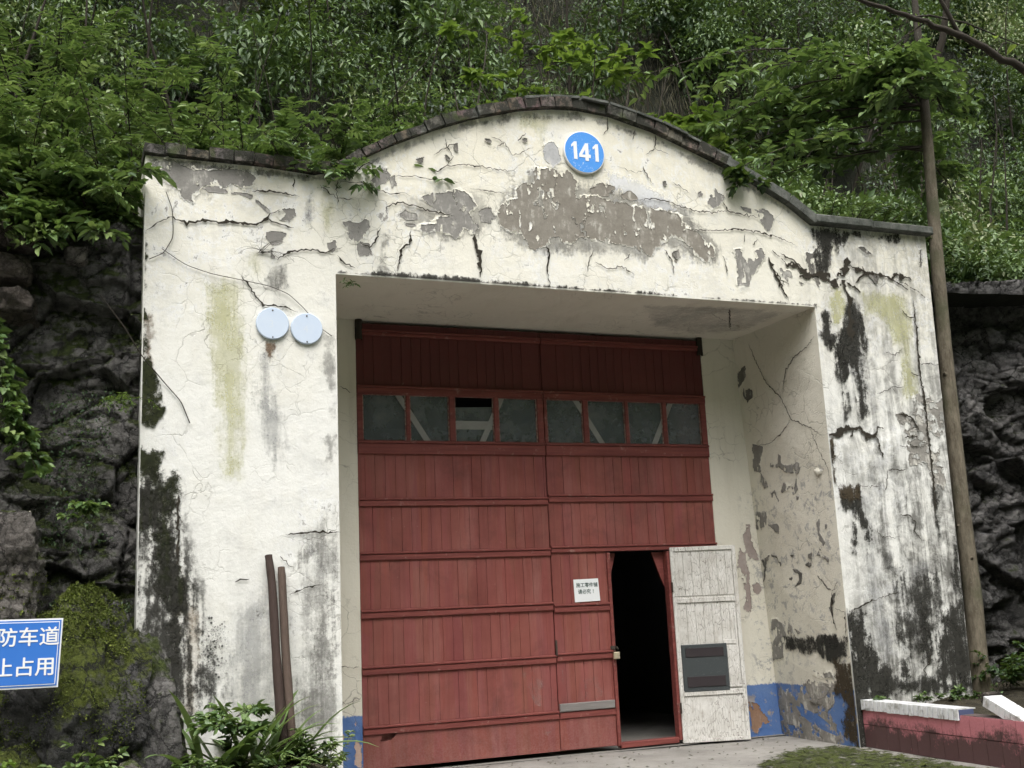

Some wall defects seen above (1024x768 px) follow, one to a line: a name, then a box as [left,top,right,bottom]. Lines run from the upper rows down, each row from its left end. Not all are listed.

water stain [142,308,166,429]
crack [241,275,296,312]
crack [147,133,529,269]
flaking render [324,218,372,256]
crack [472,234,483,277]
flaking render [398,139,716,264]
flaking render [732,247,766,287]
crack [618,131,939,540]
water stain [811,227,861,272]
water stain [137,448,227,716]
flaking render [737,510,836,625]
water stain [784,488,973,748]